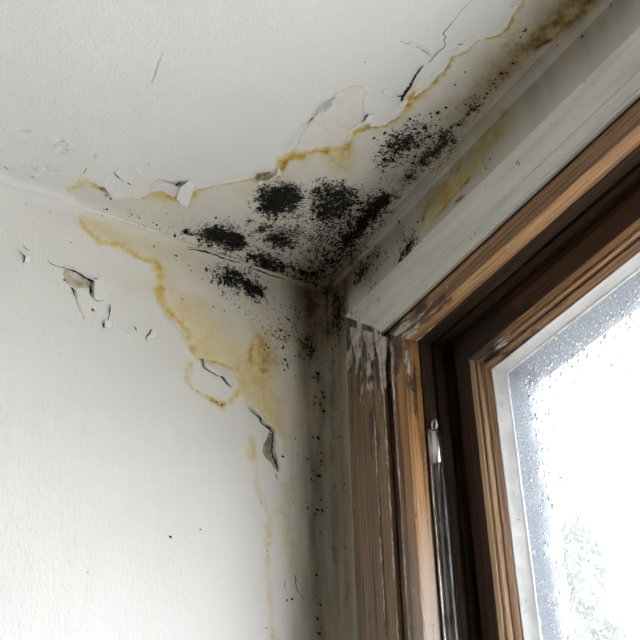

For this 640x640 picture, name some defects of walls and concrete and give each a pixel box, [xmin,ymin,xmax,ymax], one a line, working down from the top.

peeling [283,4,520,154]
crack [382,2,470,102]
peeling [92,166,281,208]
damp [166,62,515,362]
flaking render [49,262,113,329]
crack [201,359,234,392]
peeling [248,405,281,480]